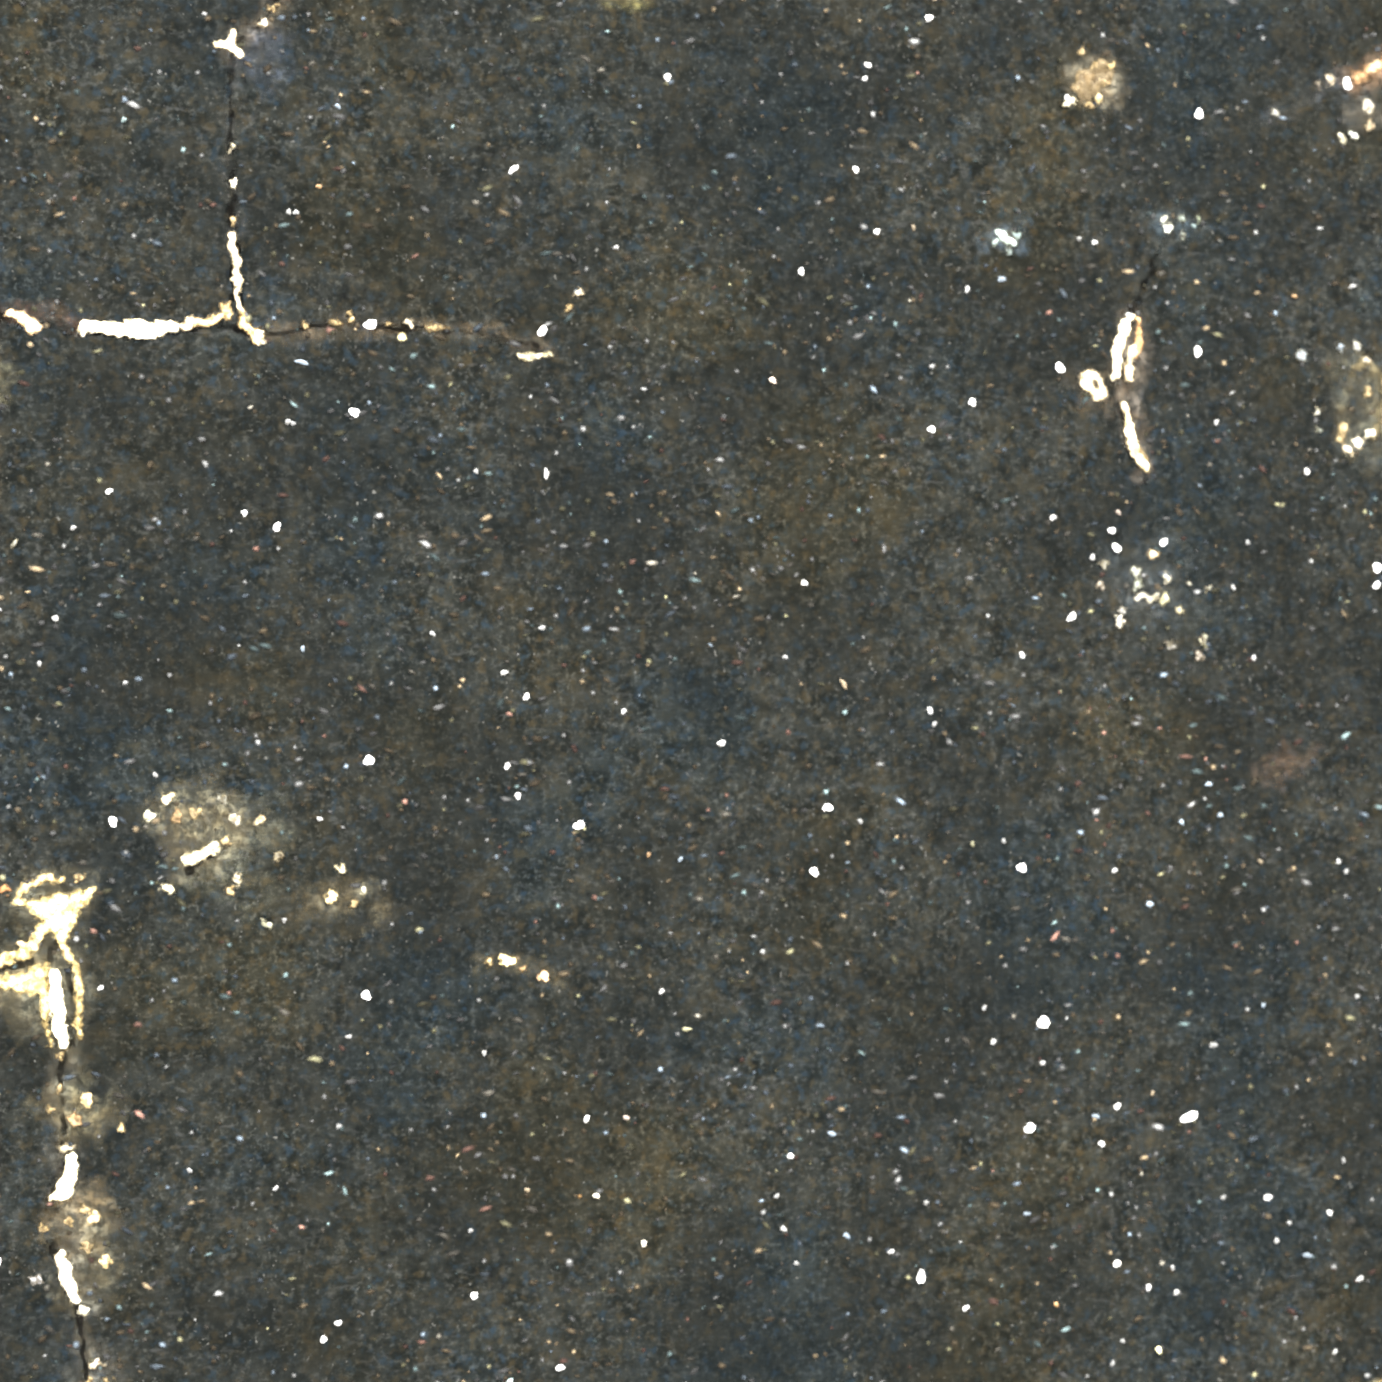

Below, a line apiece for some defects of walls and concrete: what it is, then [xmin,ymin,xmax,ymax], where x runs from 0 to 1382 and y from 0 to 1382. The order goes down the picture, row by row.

crack [78,0,448,344]
crack [565,288,584,311]
crack [0,309,42,333]
crack [517,342,553,361]
crack [1111,260,1156,472]